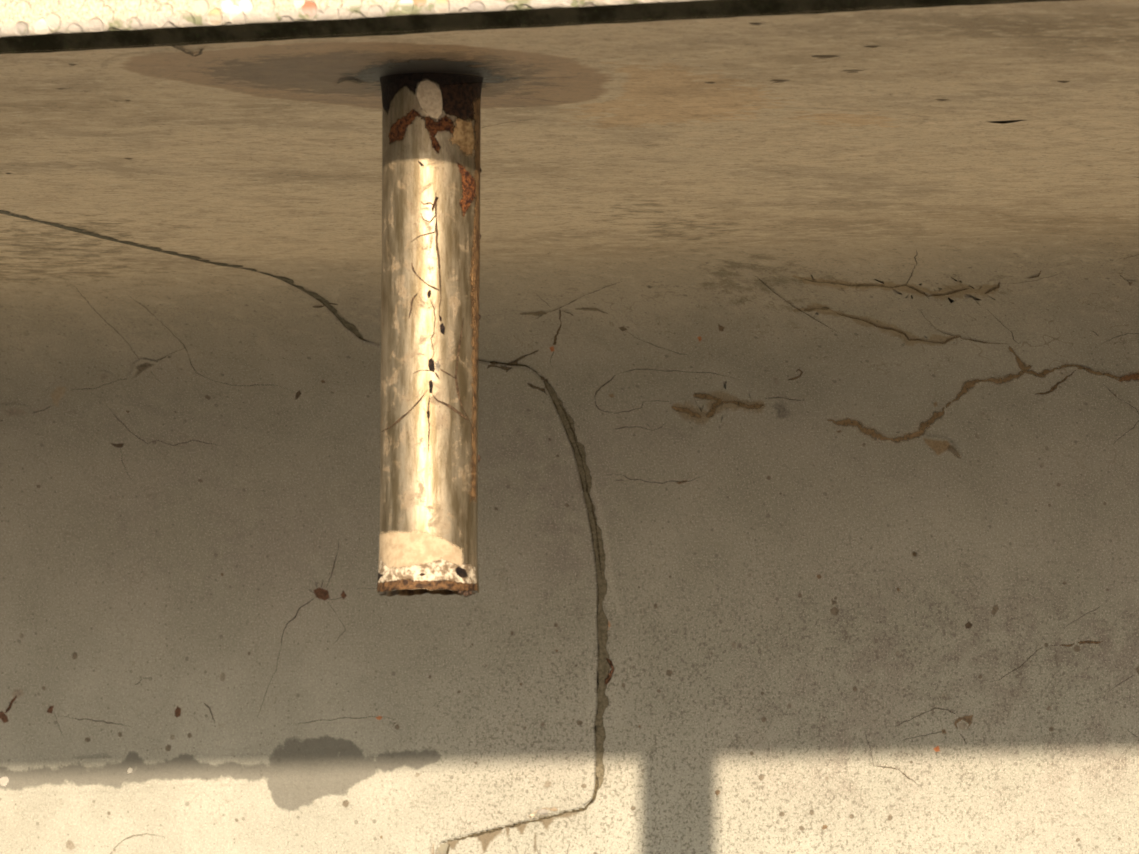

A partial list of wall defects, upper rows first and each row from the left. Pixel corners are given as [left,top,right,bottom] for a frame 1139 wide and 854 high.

damp [99,40,631,114]
rust [388,82,483,501]
crack [790,250,1139,459]
damp [0,729,446,818]